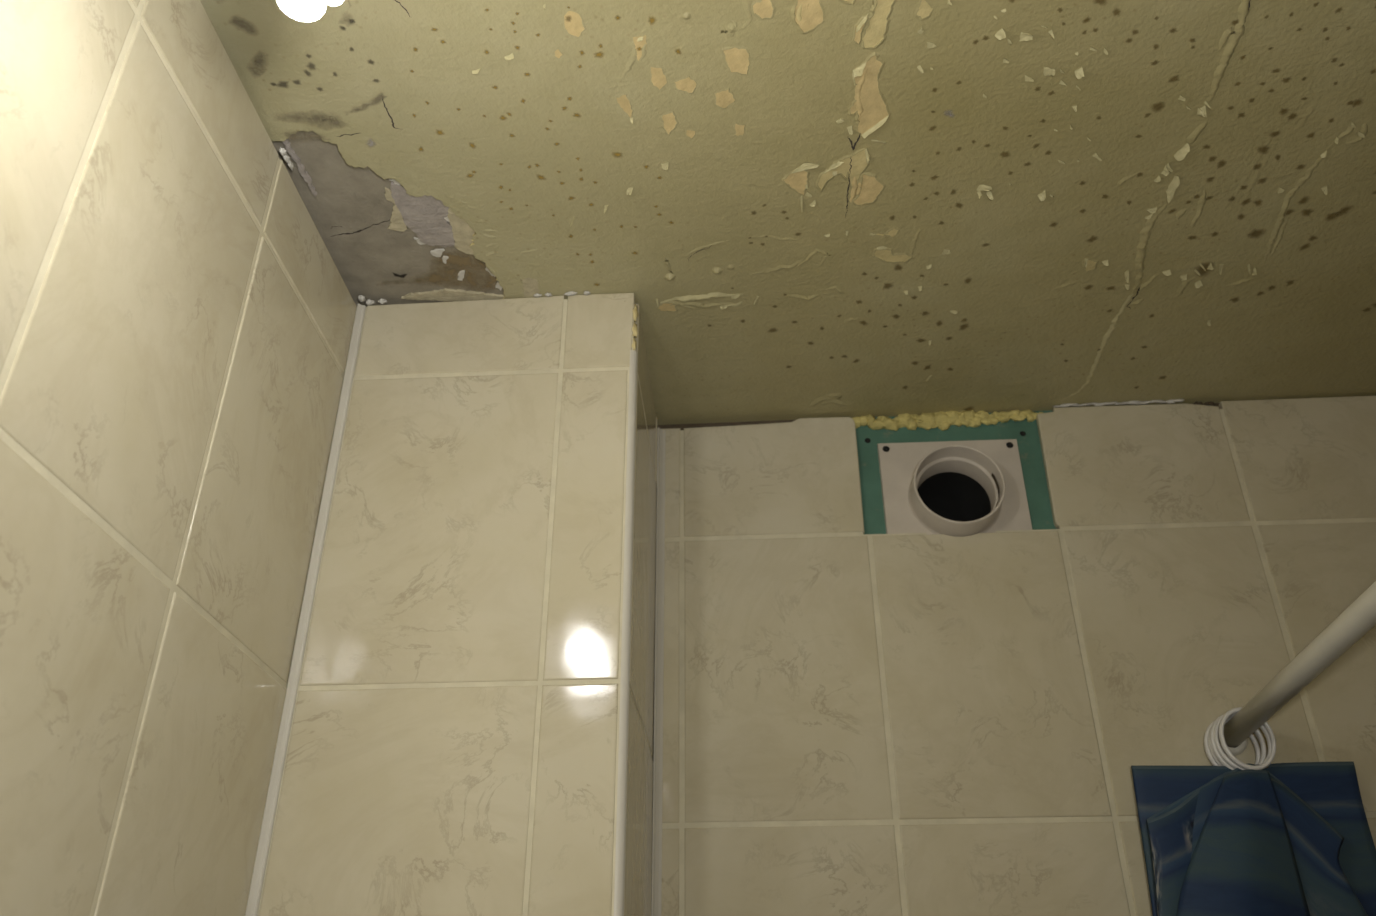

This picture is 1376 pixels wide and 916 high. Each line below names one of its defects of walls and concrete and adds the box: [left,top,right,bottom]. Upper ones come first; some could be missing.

damp [271,55,322,91]
peeling [554,10,586,59]
peeling [615,34,697,124]
peeling [715,0,897,211]
peeling [993,9,1054,63]
peeling [1025,47,1108,164]
spalling [272,130,542,307]
peeling [976,184,994,200]
crack [1060,0,1368,402]
peeling [656,292,759,312]